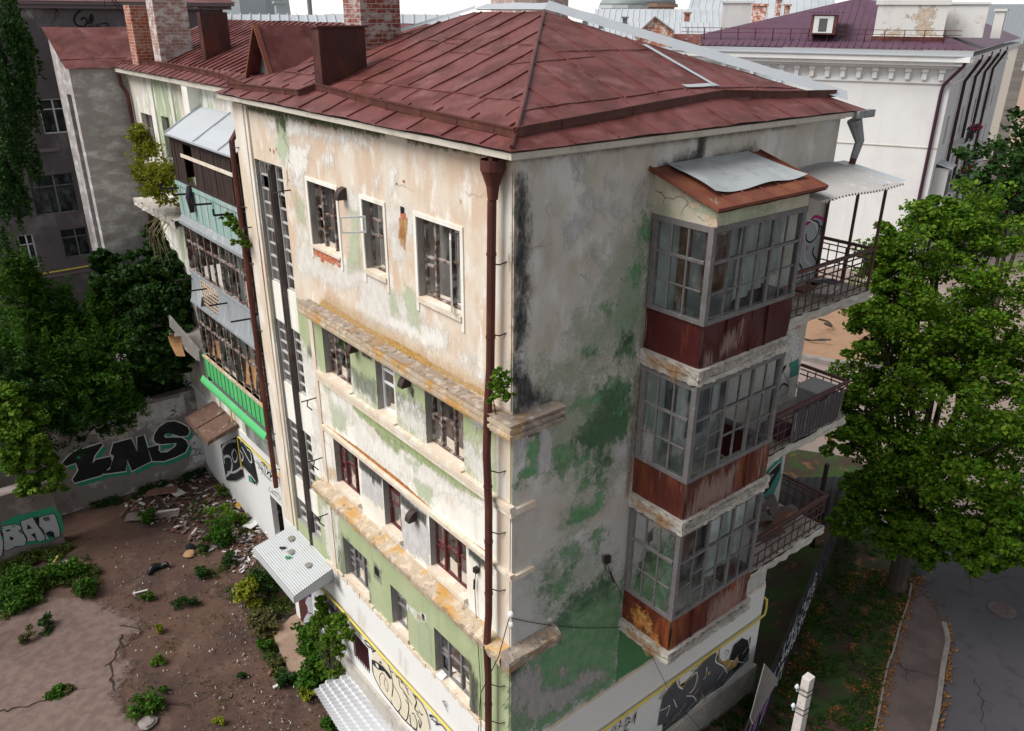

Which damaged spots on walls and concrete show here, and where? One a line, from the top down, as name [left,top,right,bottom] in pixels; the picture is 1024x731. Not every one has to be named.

peeling [314,211,361,268]
rust [399,218,407,249]
peeling [390,287,419,330]
water stain [512,314,527,386]
water stain [514,429,553,474]
water stain [612,376,640,496]
peeling [320,501,341,565]
peeling [400,506,430,566]
spalling [406,604,426,622]
rust [627,605,661,655]